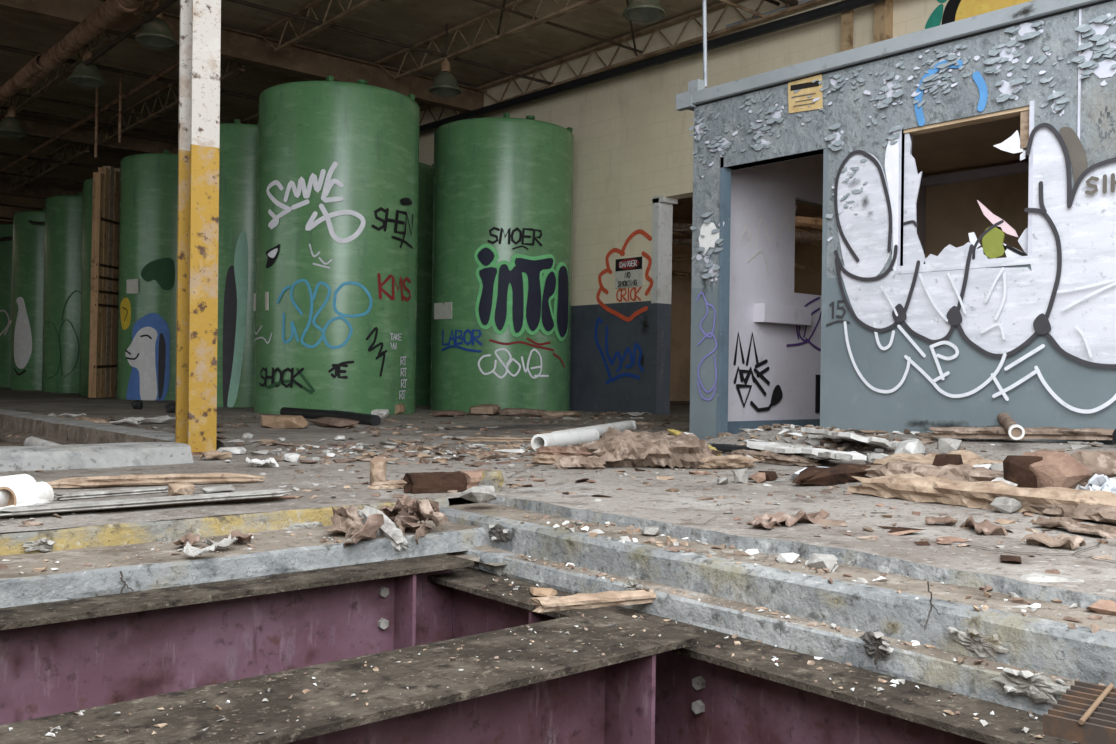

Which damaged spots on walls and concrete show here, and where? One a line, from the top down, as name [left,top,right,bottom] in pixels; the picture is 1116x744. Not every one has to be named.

peeling [824,123,868,227]
peeling [689,12,1116,177]